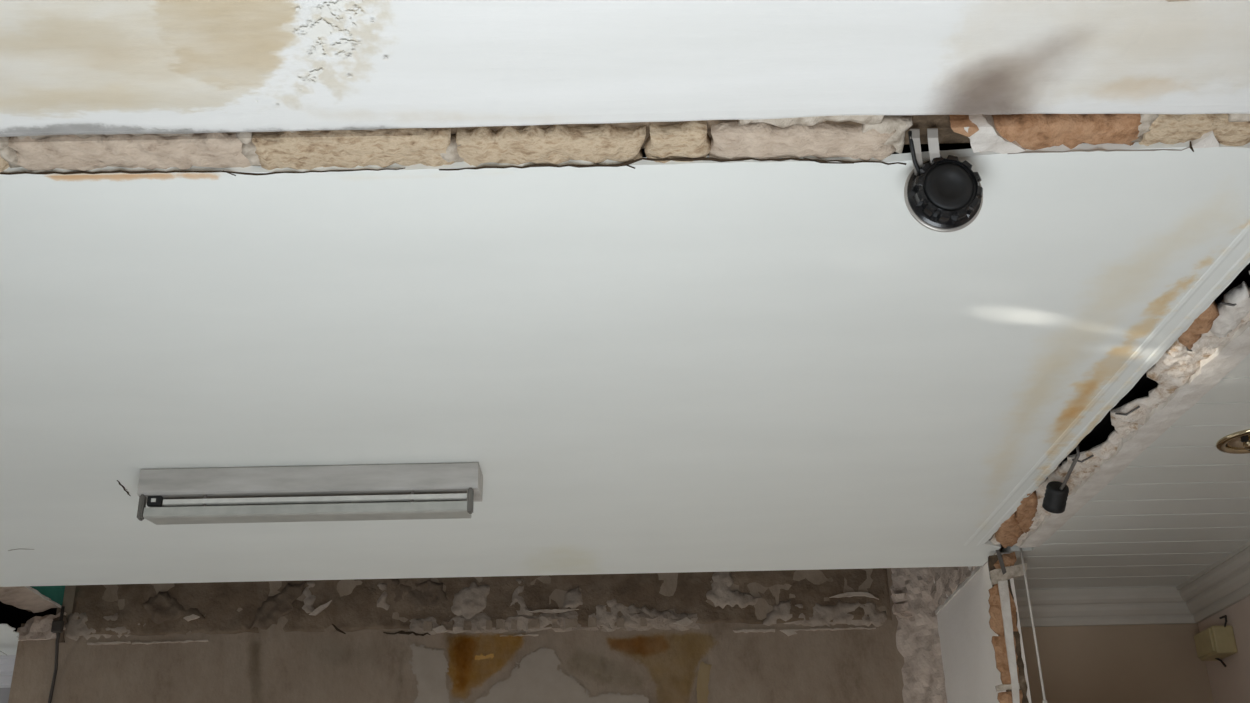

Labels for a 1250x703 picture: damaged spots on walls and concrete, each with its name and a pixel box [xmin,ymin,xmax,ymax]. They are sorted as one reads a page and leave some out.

flaking render [0,114,1250,172]
flaking render [0,263,1250,703]